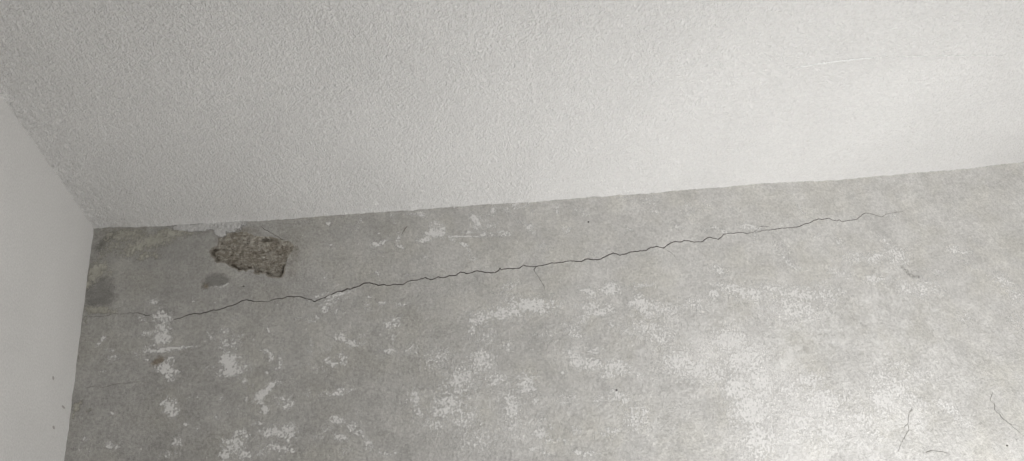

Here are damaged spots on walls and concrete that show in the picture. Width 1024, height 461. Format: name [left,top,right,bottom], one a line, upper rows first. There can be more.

spalling [209,232,294,278]
crack [89,212,896,320]